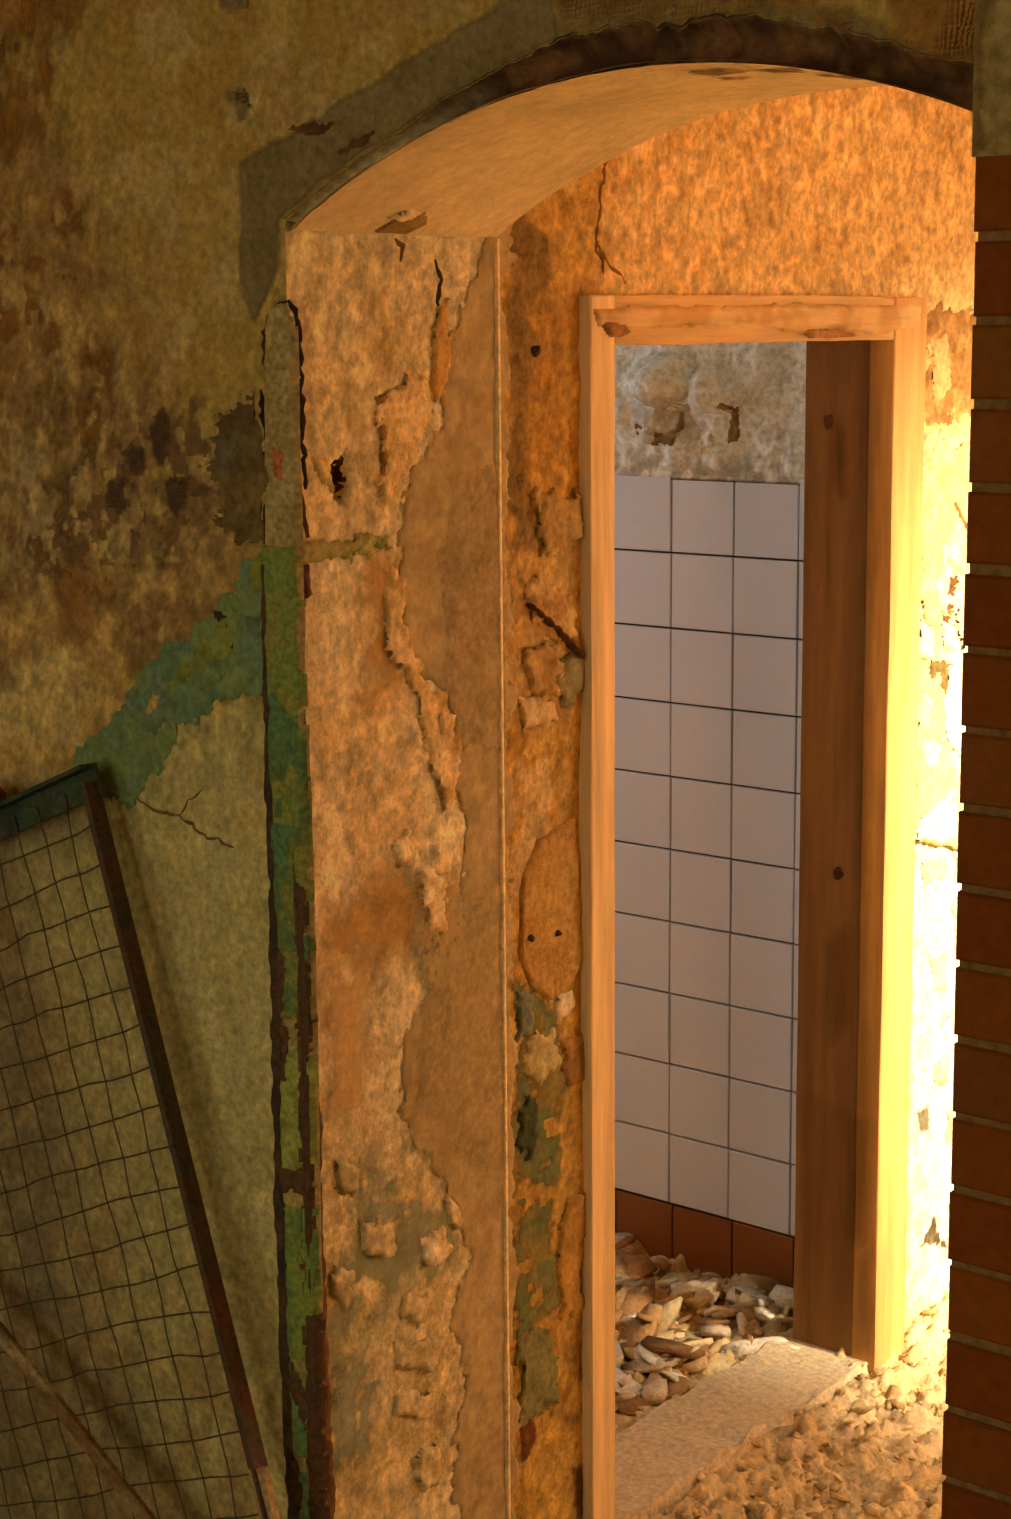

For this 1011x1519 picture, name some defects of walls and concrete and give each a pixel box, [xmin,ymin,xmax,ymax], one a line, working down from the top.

crack [595,160,626,284]
leakage [25,404,211,579]
peeling [72,391,269,811]
flaking render [373,297,452,505]
flaking render [382,566,462,812]
flaking render [517,486,586,731]
peeling [915,301,976,887]
crack [137,789,234,848]
flaking render [392,828,450,937]
corrosion [261,564,336,1519]
peeling [420,1196,463,1268]
peeling [510,981,586,1428]